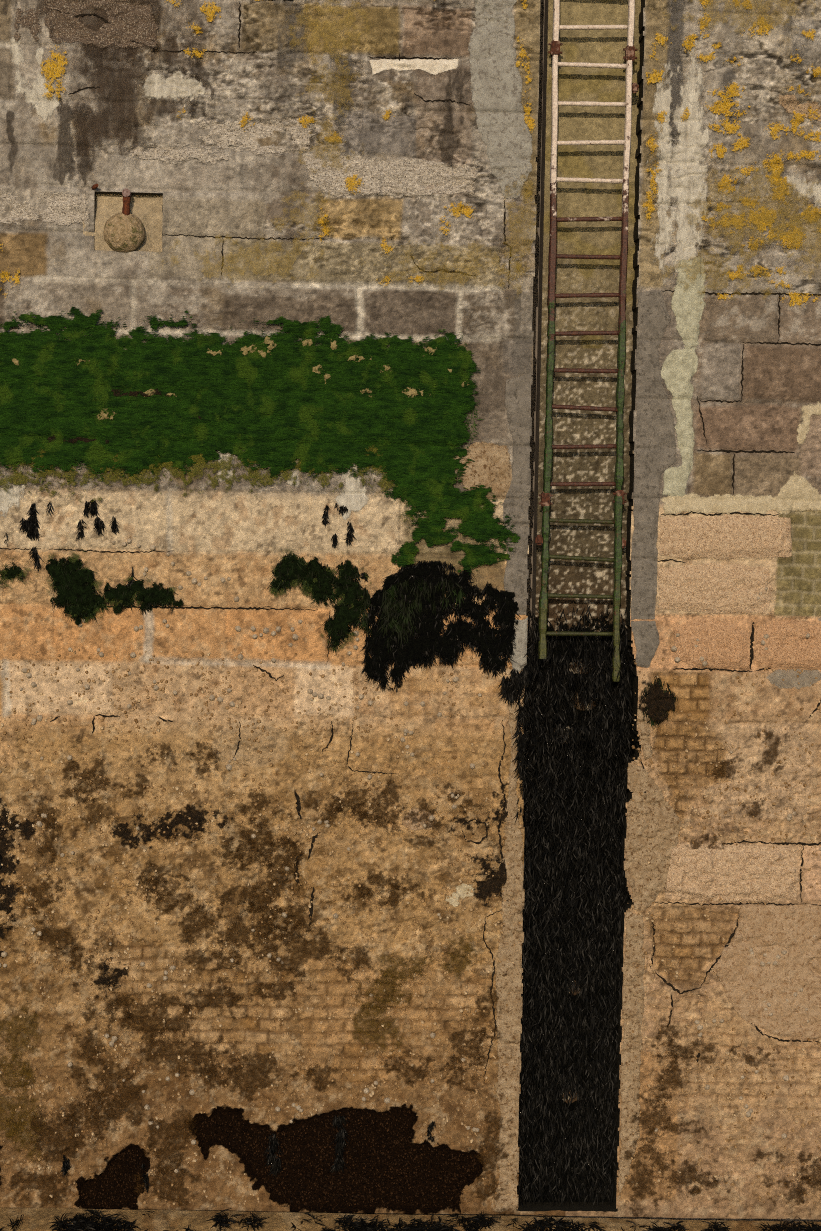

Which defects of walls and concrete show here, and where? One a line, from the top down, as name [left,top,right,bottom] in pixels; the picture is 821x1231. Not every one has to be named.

damp [7,111,17,167]
damp [10,0,214,185]
peeling [184,702,525,1215]
crack [650,840,821,1024]
crack [751,1023,821,1043]
peeling [74,1144,150,1210]